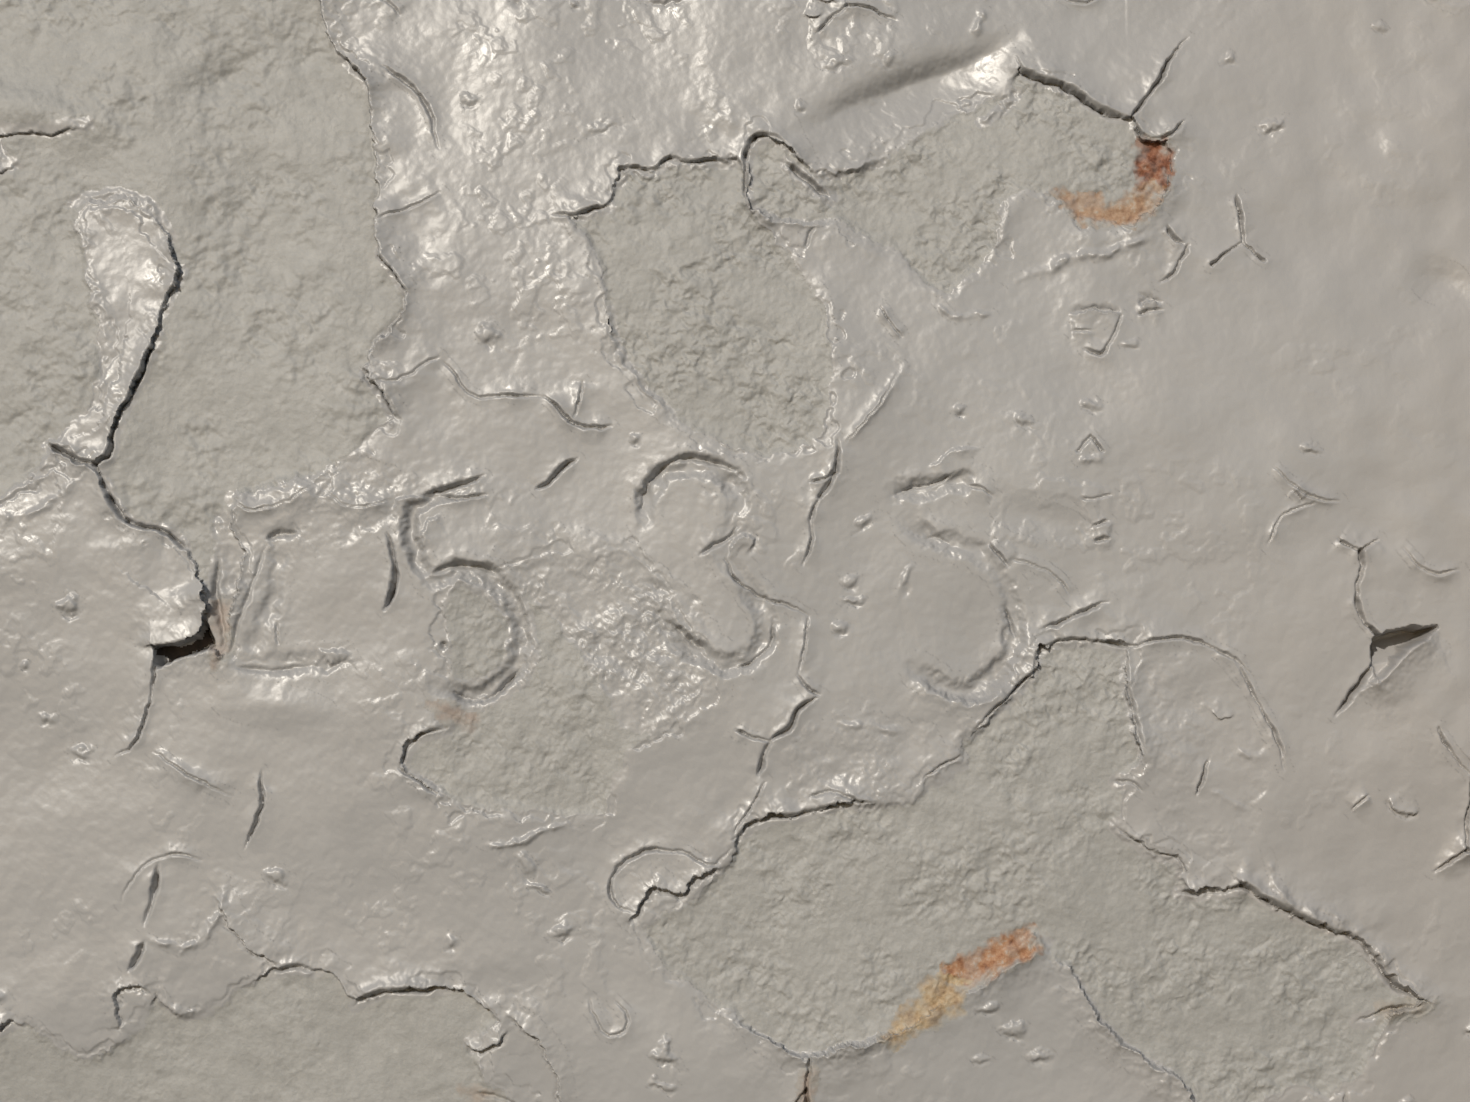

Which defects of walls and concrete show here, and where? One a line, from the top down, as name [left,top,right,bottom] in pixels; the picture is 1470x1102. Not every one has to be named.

peeling [0,0,437,600]
peeling [546,31,1195,457]
rust [1048,131,1178,231]
crack [1151,188,1274,292]
spalling [154,627,214,662]
crack [692,299,909,841]
crack [983,535,1118,640]
crack [1261,460,1452,724]
peeling [0,846,577,1102]
rust [876,921,1046,1053]
peeling [602,630,1438,1102]
crack [1425,720,1470,880]